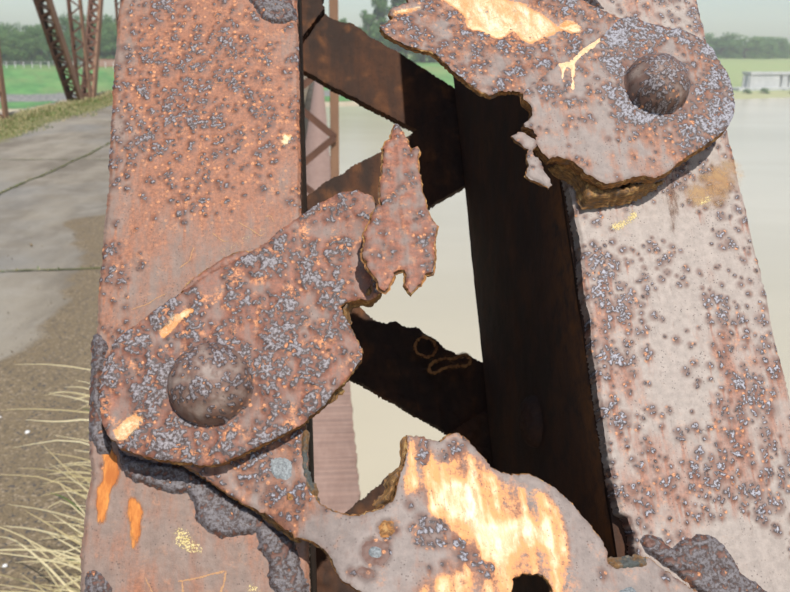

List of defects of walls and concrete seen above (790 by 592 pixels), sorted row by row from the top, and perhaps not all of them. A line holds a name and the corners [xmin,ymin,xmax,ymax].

rust [249,0,298,24]
peeling [461,0,548,37]
peeling [560,20,580,33]
rust [511,132,665,210]
rust [181,250,249,293]
peeling [116,419,138,439]
rust [84,333,310,592]
spalling [270,457,292,480]
peeling [449,484,545,554]
hole [356,520,395,579]
rust [607,534,767,592]